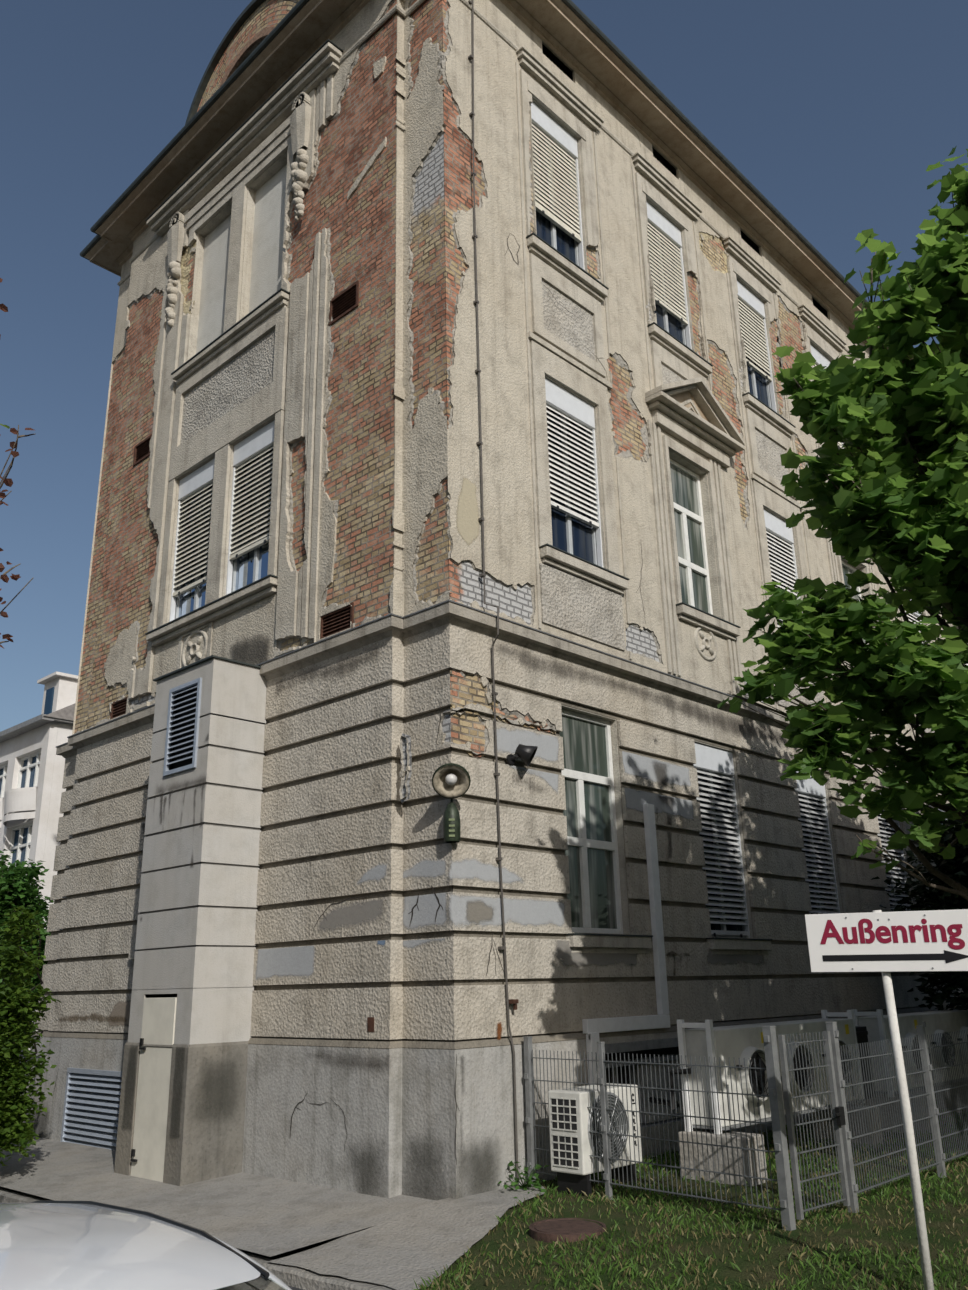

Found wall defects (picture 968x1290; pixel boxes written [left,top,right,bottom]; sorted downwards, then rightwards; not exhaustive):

flaking render [699,232,728,274]
flaking render [286,0,488,628]
flaking render [607,353,650,463]
flaking render [687,272,750,530]
flaking render [769,295,805,417]
flaking render [74,288,164,734]
flaking render [412,477,535,625]
flaking render [625,623,663,664]
flaking render [437,668,557,758]
leakage [171,1049,184,1137]
crack [290,1095,347,1151]
leakage [463,1151,493,1194]